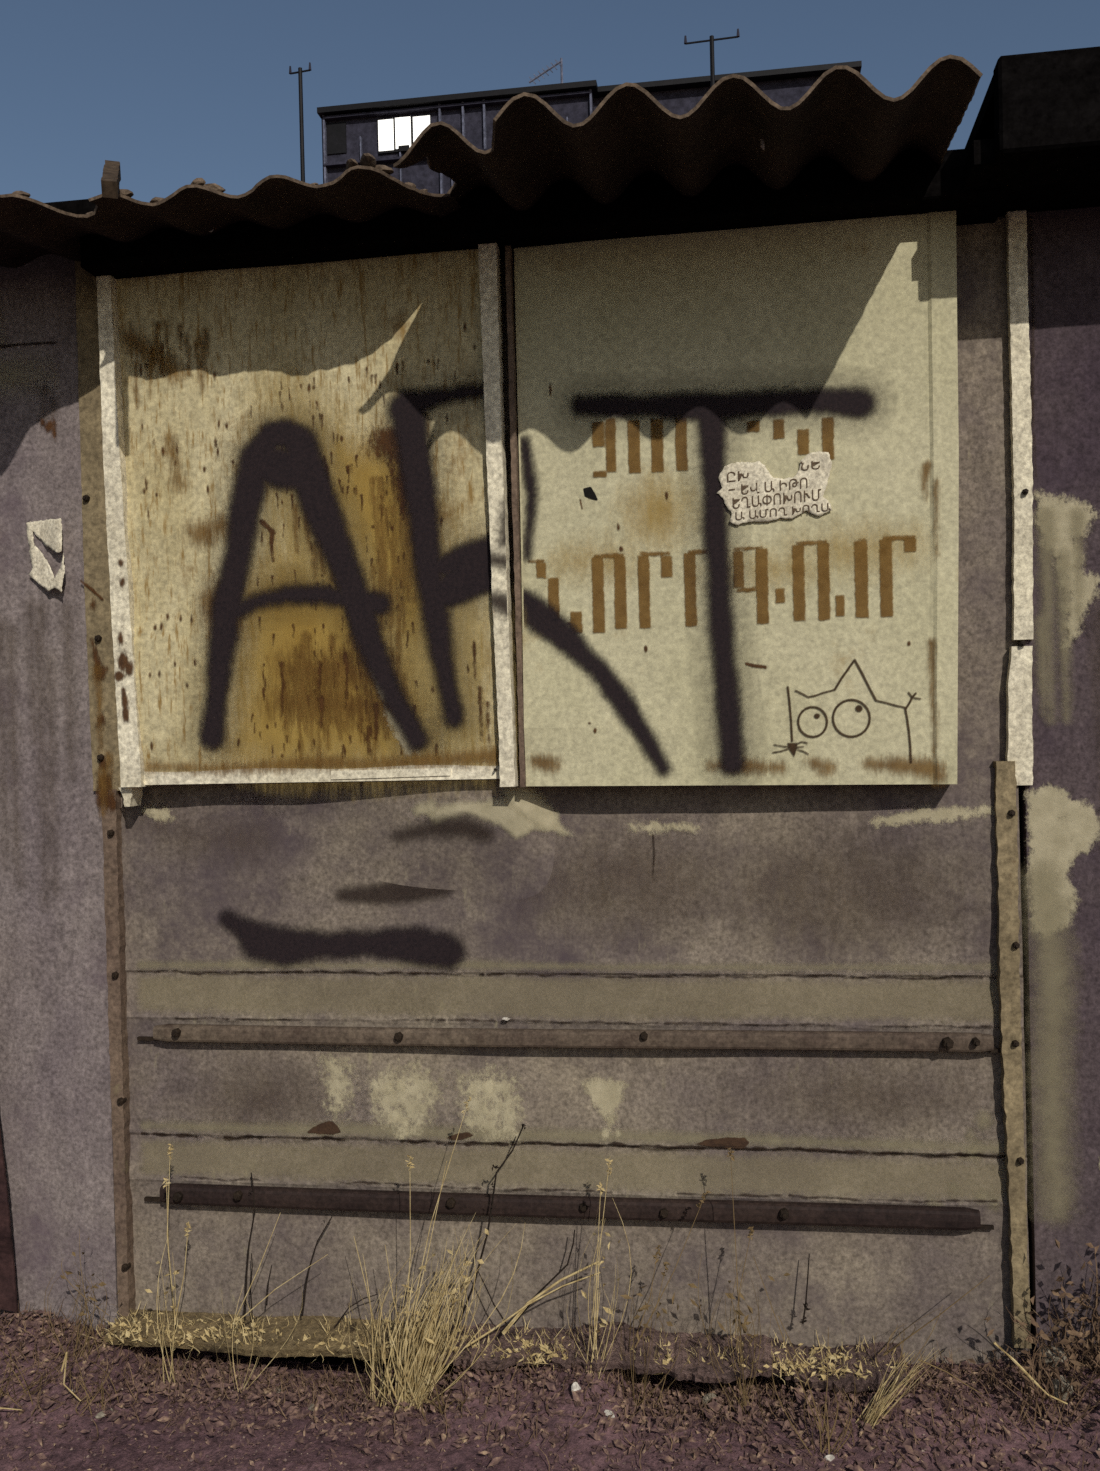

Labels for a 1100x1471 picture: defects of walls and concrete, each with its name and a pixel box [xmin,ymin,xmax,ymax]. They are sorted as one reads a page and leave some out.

peeling [1034,493,1100,678]
leakage [338,1126,816,1143]